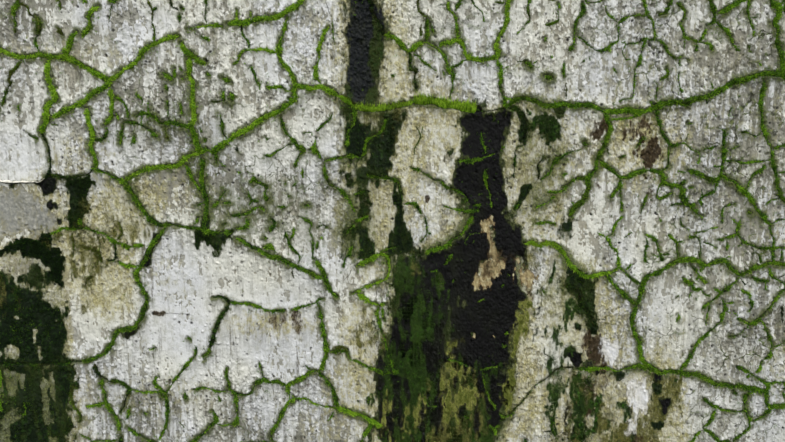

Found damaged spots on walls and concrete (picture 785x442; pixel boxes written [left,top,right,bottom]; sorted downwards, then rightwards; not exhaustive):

leakage [0,232,79,442]
crack [68,385,82,423]
crack [74,434,123,442]
crack [86,347,197,442]
crack [0,0,494,368]
crack [183,246,399,442]
crack [480,366,496,409]
leakage [335,0,643,442]
crack [499,80,785,442]